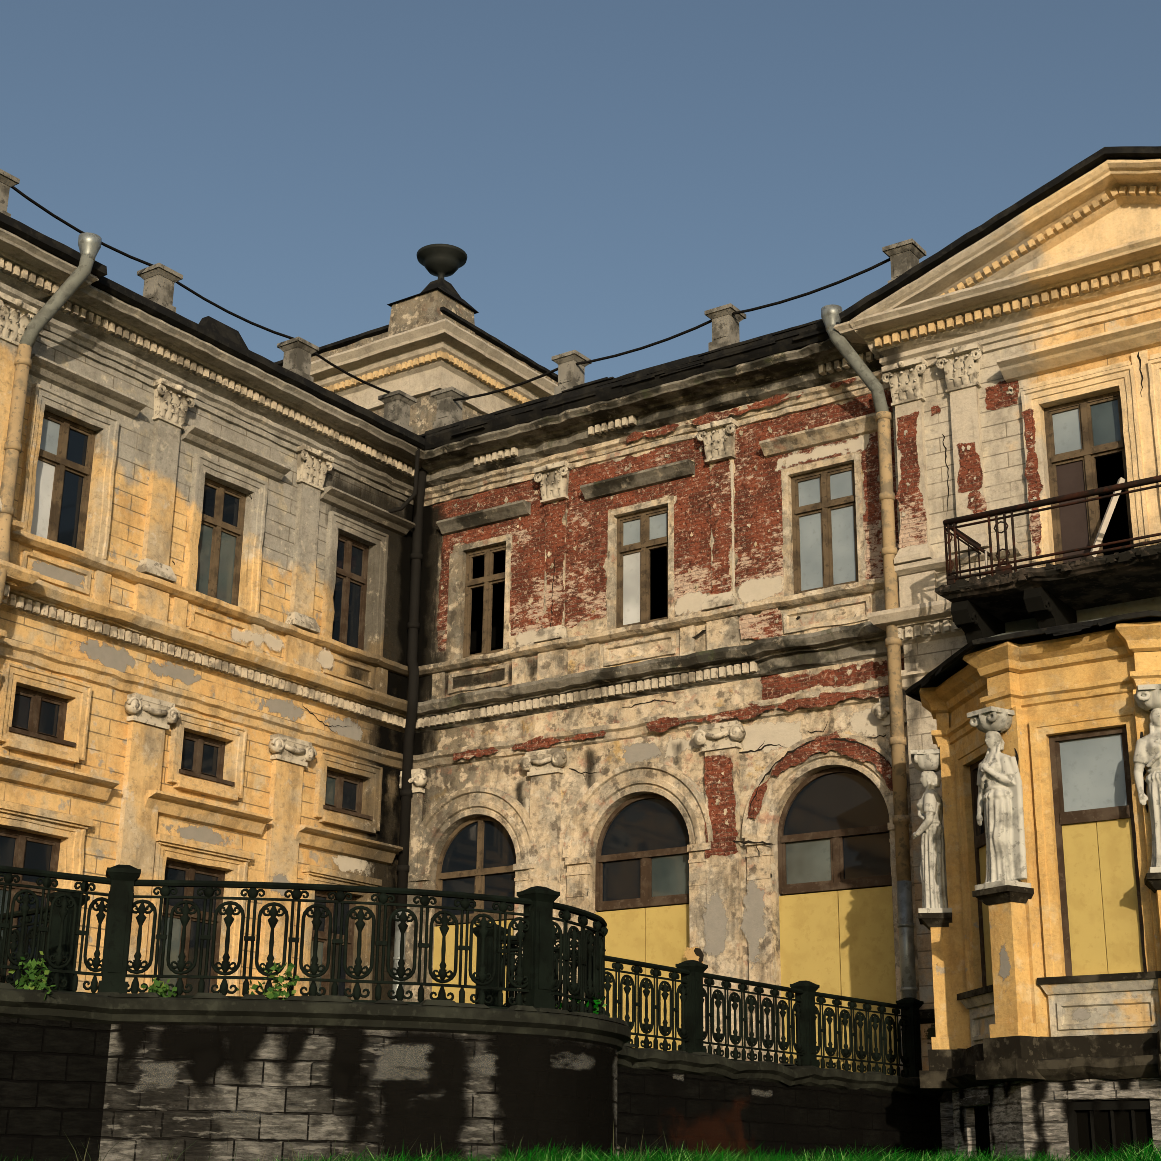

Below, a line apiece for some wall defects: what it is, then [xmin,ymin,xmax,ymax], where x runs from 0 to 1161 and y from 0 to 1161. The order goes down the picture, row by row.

flaking render [956,442,987,514]
flaking render [985,380,1044,556]
flaking render [432,390,941,652]
flaking render [70,639,201,685]
flaking render [622,657,905,859]
flaking render [165,825,233,846]
damp [115,1022,310,1090]
damp [326,1026,617,1161]
damp [959,1088,967,1144]
damp [1031,1080,1076,1161]
damp [1093,1083,1102,1114]
damp [1117,1079,1132,1110]